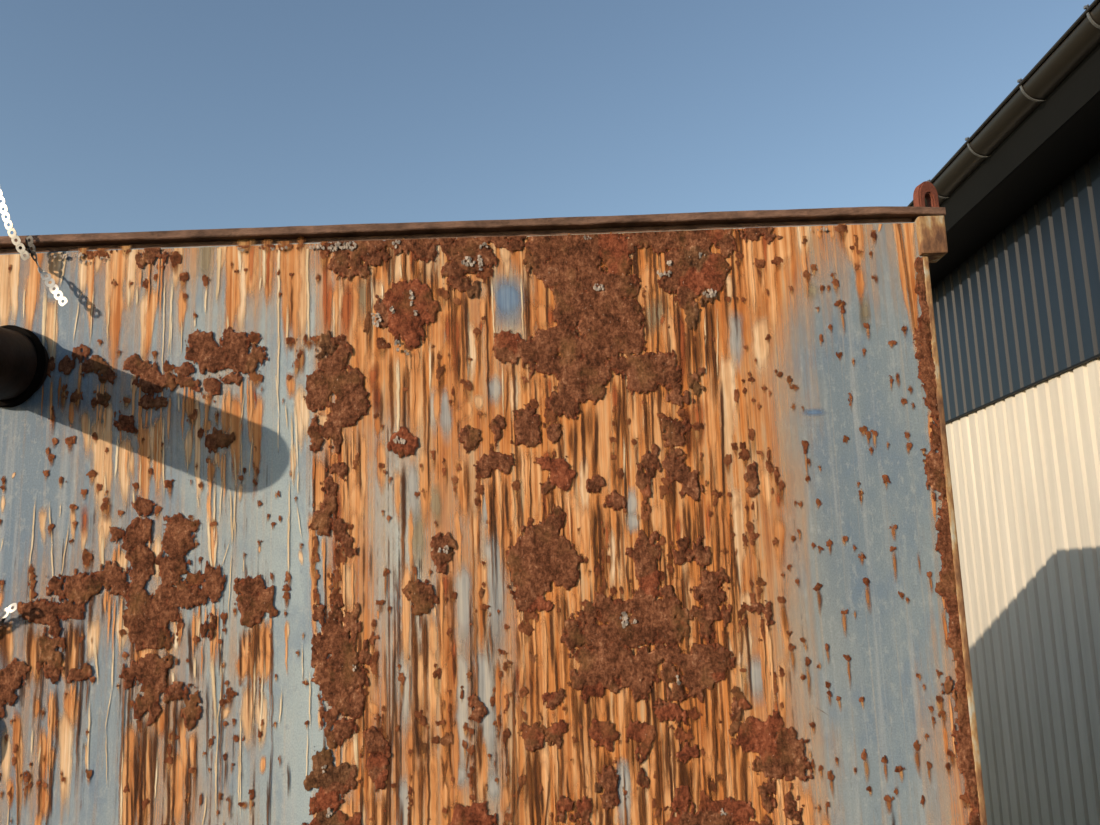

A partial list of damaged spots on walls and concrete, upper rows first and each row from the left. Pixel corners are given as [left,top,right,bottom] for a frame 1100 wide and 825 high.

rust [0,223,981,825]